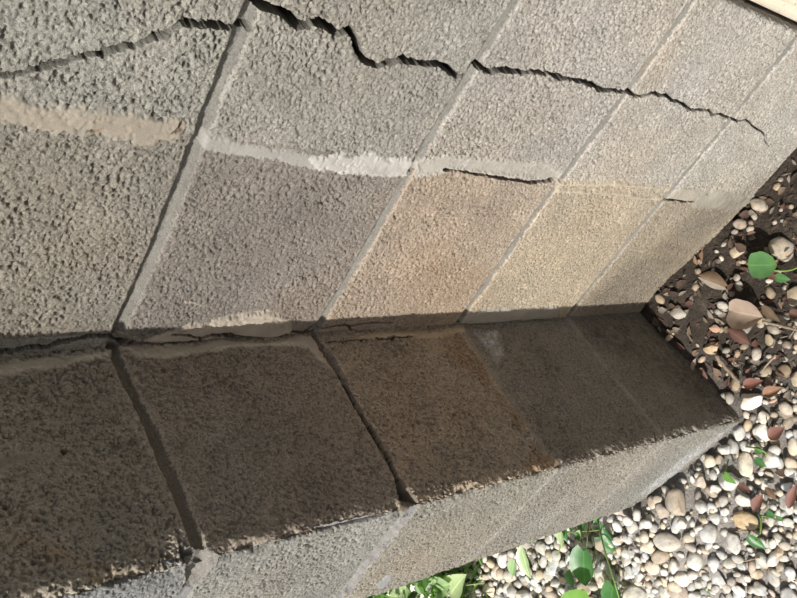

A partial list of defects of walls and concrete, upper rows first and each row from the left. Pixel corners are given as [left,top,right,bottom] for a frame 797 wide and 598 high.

crack [0,0,770,147]